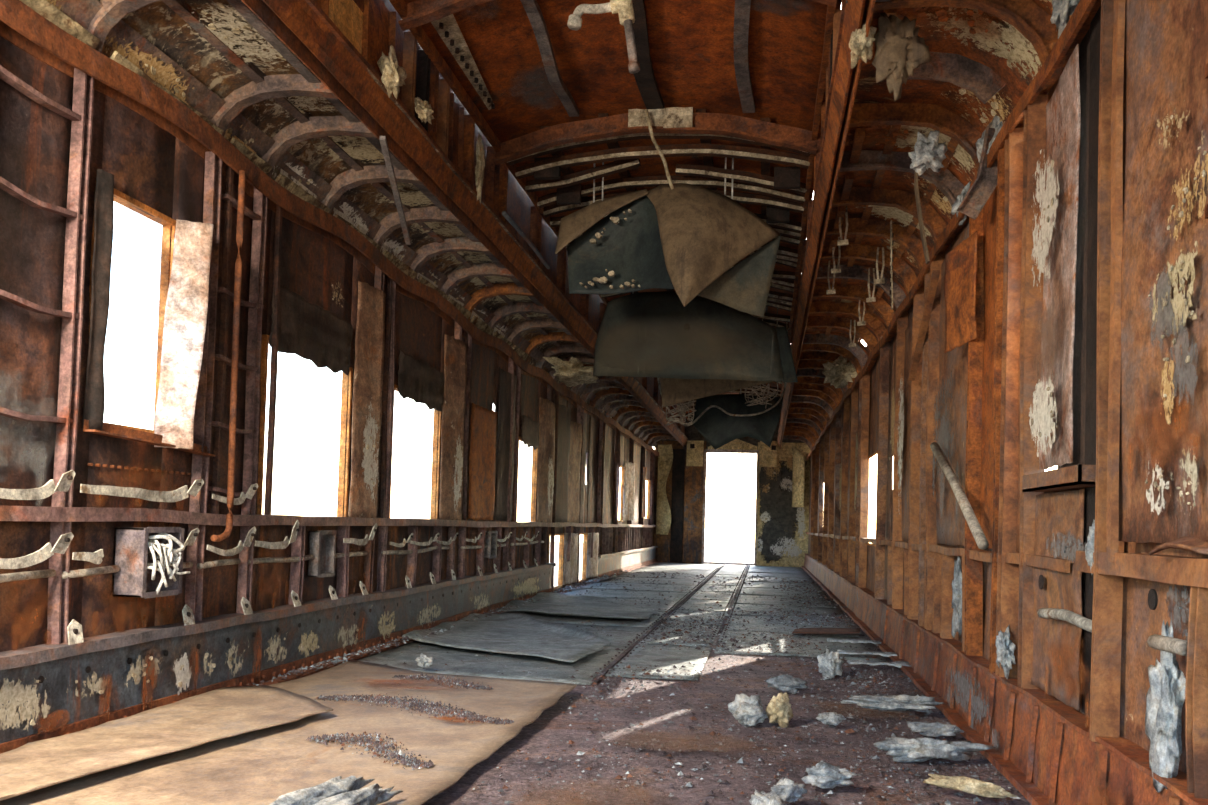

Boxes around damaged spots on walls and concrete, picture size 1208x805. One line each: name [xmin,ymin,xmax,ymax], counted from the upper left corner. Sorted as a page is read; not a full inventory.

peeling [1031,149,1060,293]
peeling [1148,143,1208,424]
peeling [1029,375,1060,457]
peeling [1145,447,1199,516]
peeling [757,506,806,557]
peeling [0,675,50,732]
corrosion [39,709,69,732]
corrosion [142,655,156,711]
peeling [125,640,245,695]